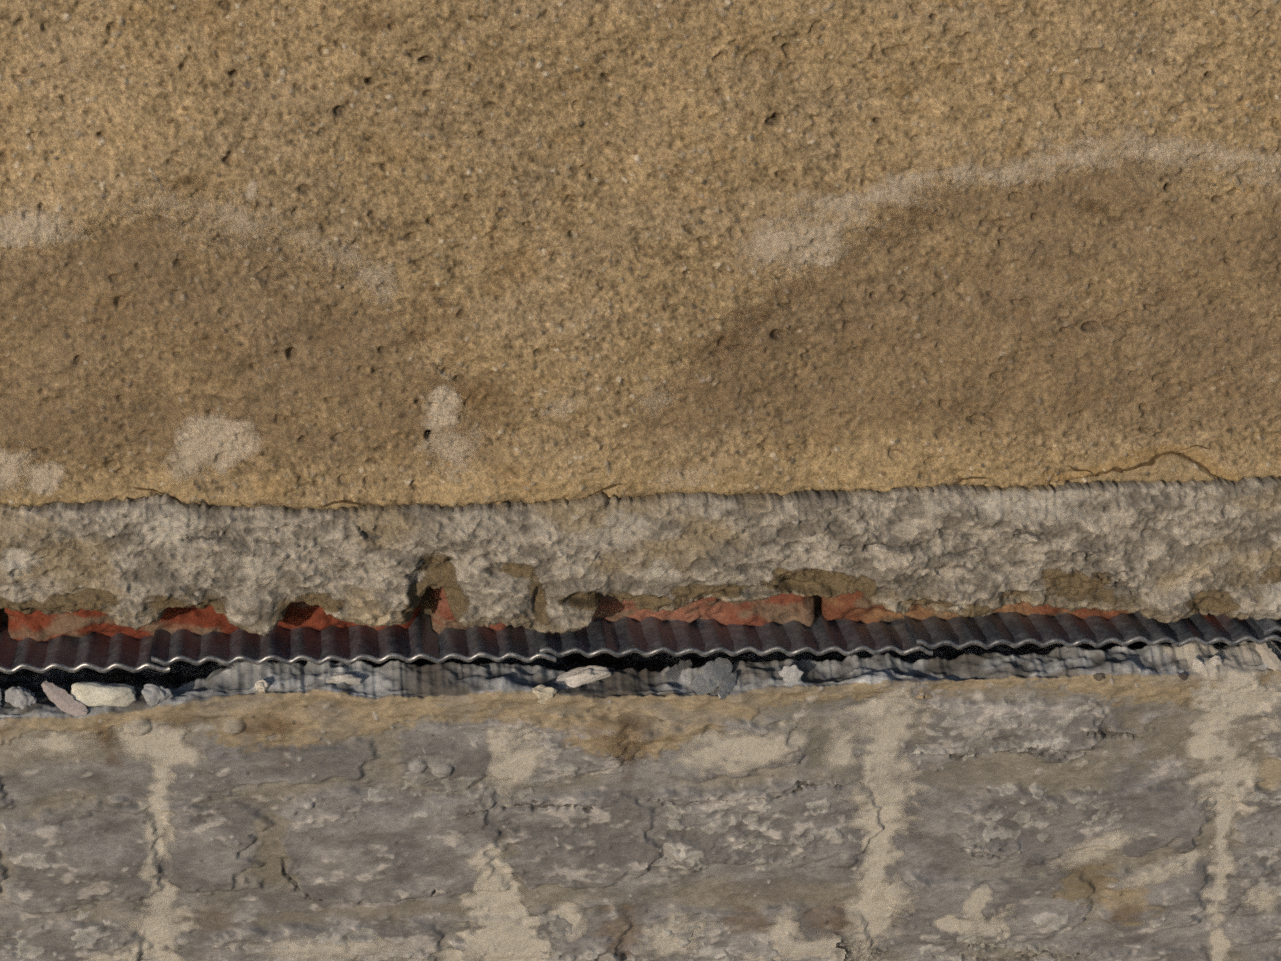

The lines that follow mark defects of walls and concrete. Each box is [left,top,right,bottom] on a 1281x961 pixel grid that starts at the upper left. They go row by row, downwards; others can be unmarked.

damp [740,128,1281,270]
crack [1047,445,1223,485]
flaking render [0,589,240,642]
spalling [277,554,470,634]
flaking render [484,563,1139,631]
spalling [1187,590,1239,615]
spalling [1259,565,1281,585]
damp [673,721,808,776]
damp [14,722,205,961]
damp [748,683,929,961]
damp [1123,641,1281,961]
damp [420,842,587,961]